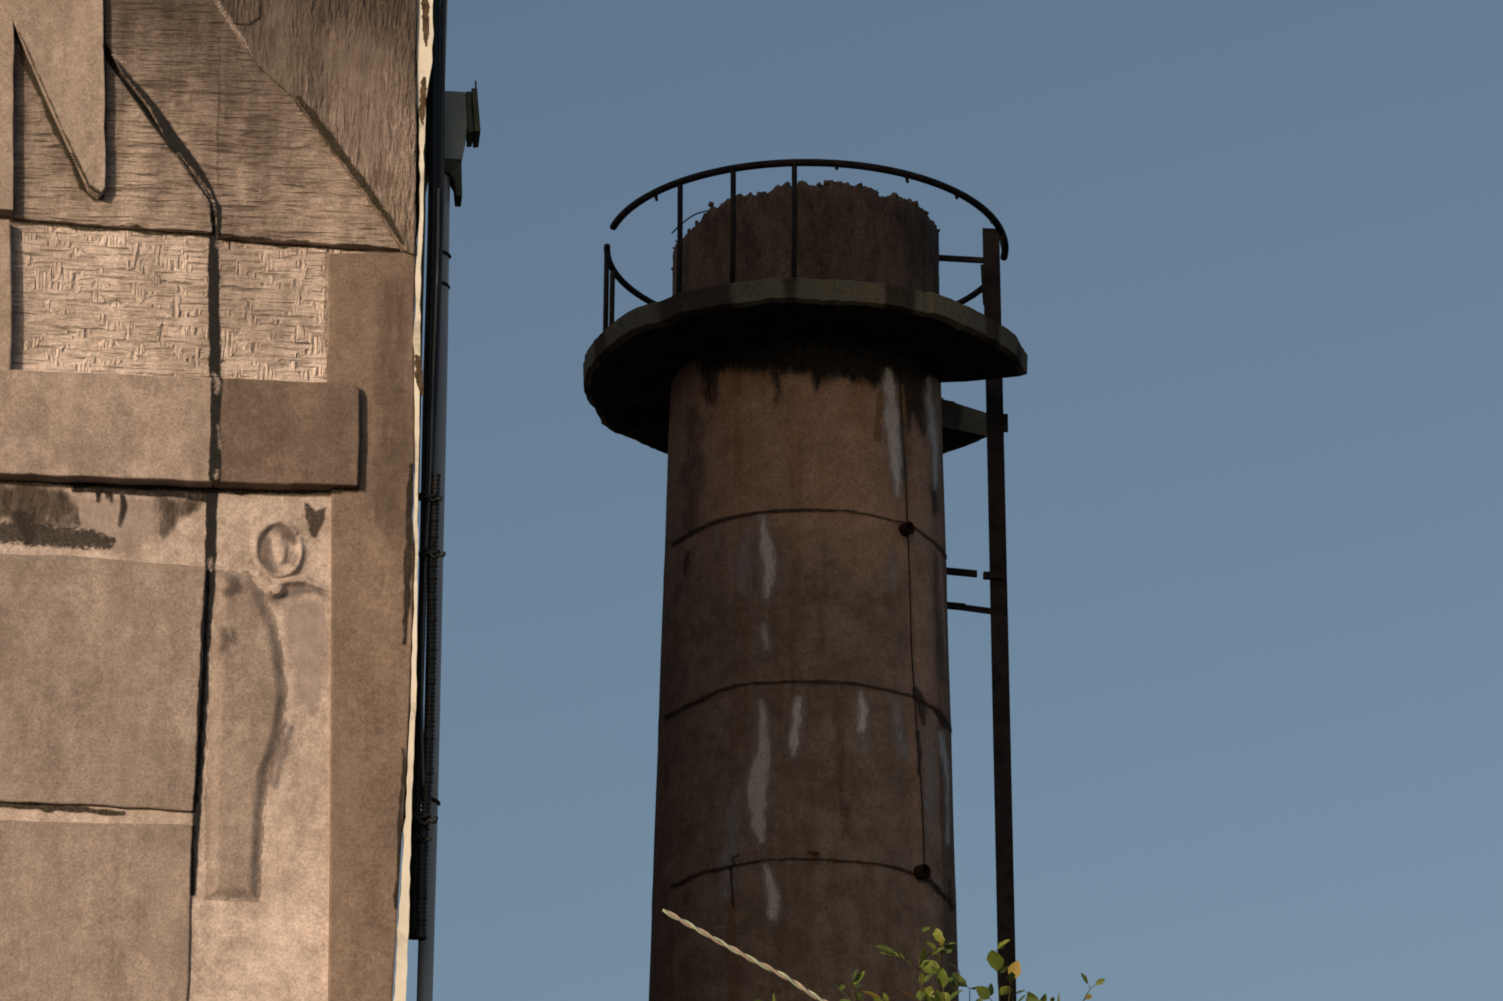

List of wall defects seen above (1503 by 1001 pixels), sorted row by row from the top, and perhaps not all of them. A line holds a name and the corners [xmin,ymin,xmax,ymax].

efflorescence [884,370,902,496]
efflorescence [925,378,938,490]
damp [0,482,208,550]
efflorescence [738,515,775,599]
efflorescence [718,700,770,901]
efflorescence [789,697,802,756]
damp [857,692,868,753]
damp [893,686,950,844]
efflorescence [763,865,780,919]